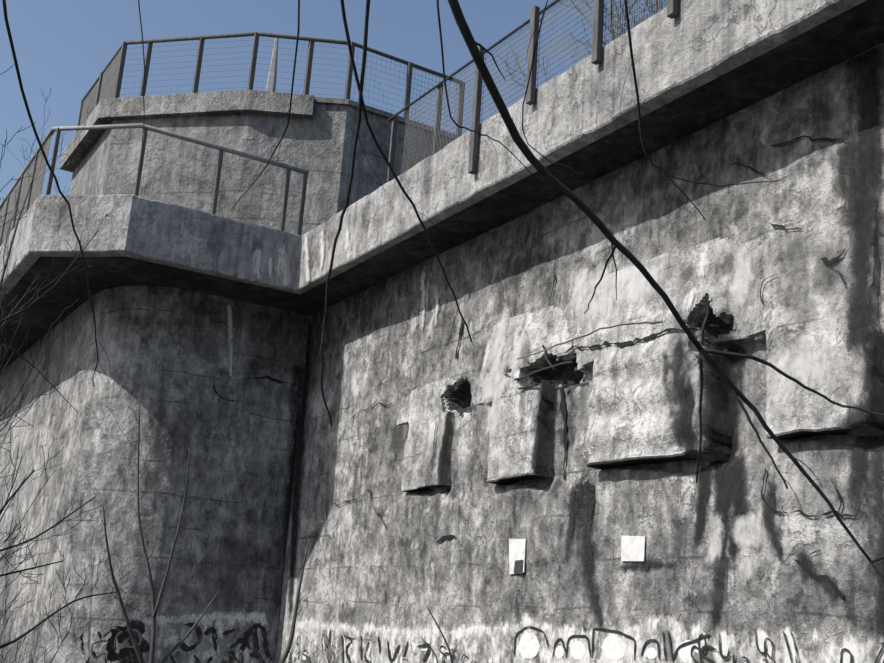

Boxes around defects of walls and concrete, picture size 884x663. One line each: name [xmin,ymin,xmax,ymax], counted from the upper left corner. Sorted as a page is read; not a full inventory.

water stain [284,321,314,614]
spalling [445,376,472,416]
spalling [483,345,584,445]
water stain [531,380,566,479]
crack [564,327,701,369]
spalling [683,298,737,350]
water stain [662,332,781,626]
crack [761,468,859,518]
water stain [832,47,884,642]
water stain [564,473,605,630]
water stain [795,549,836,599]